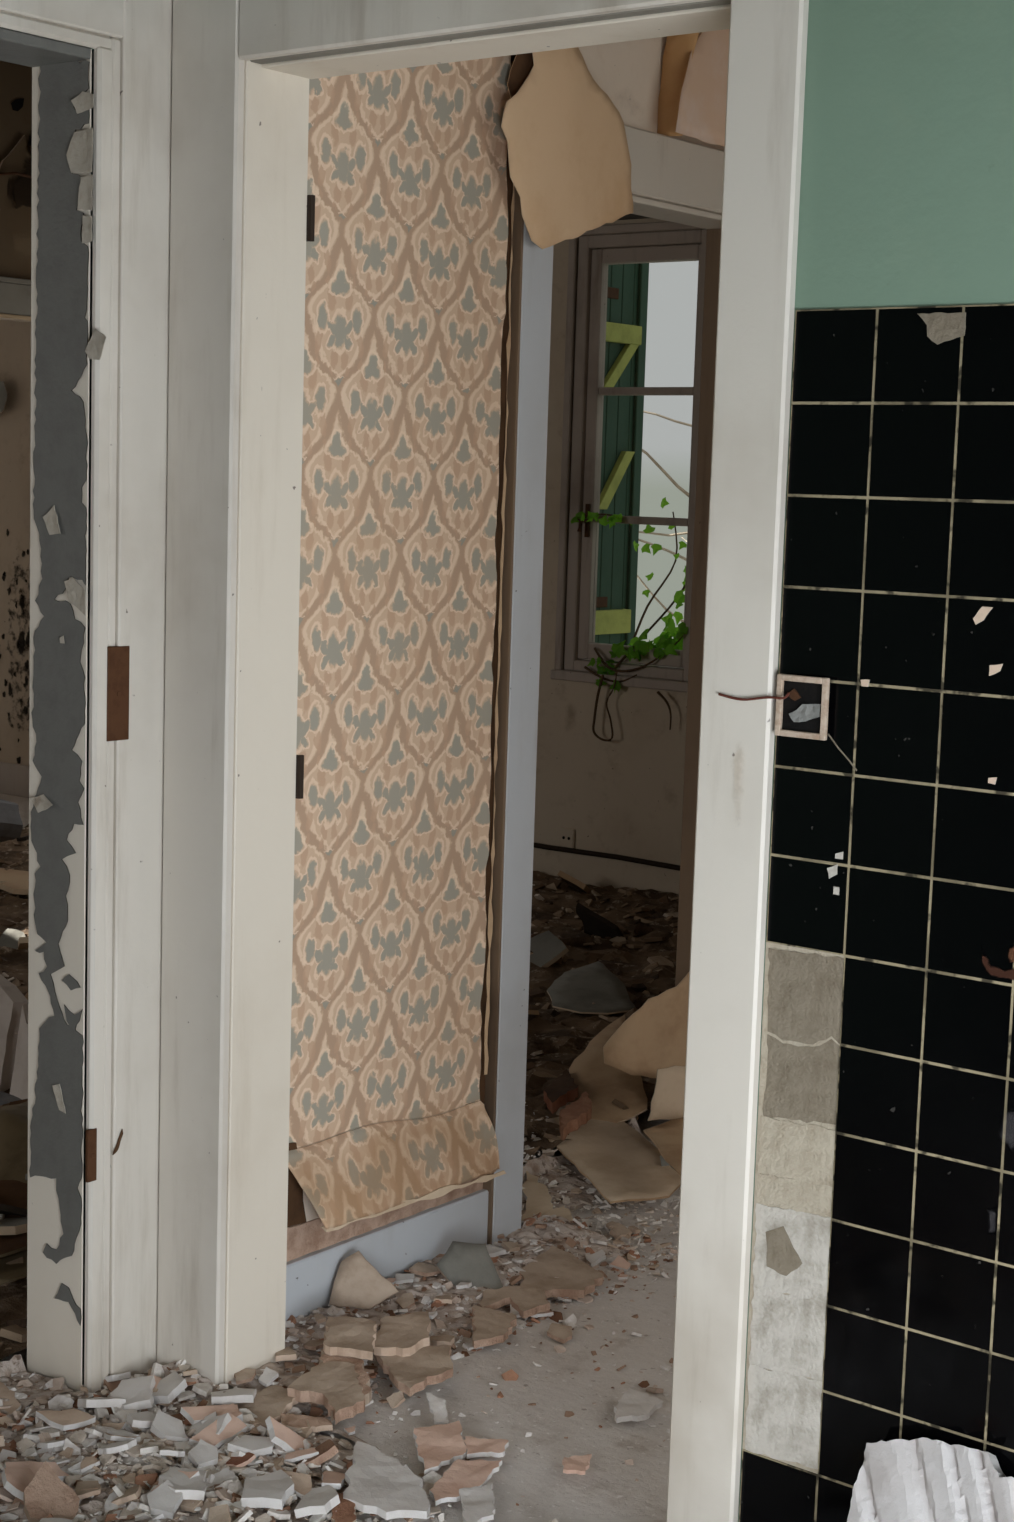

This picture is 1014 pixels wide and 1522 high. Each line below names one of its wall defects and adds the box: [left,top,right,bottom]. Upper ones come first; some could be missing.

peeling [0,60,106,1264]
peeling [54,1283,82,1326]